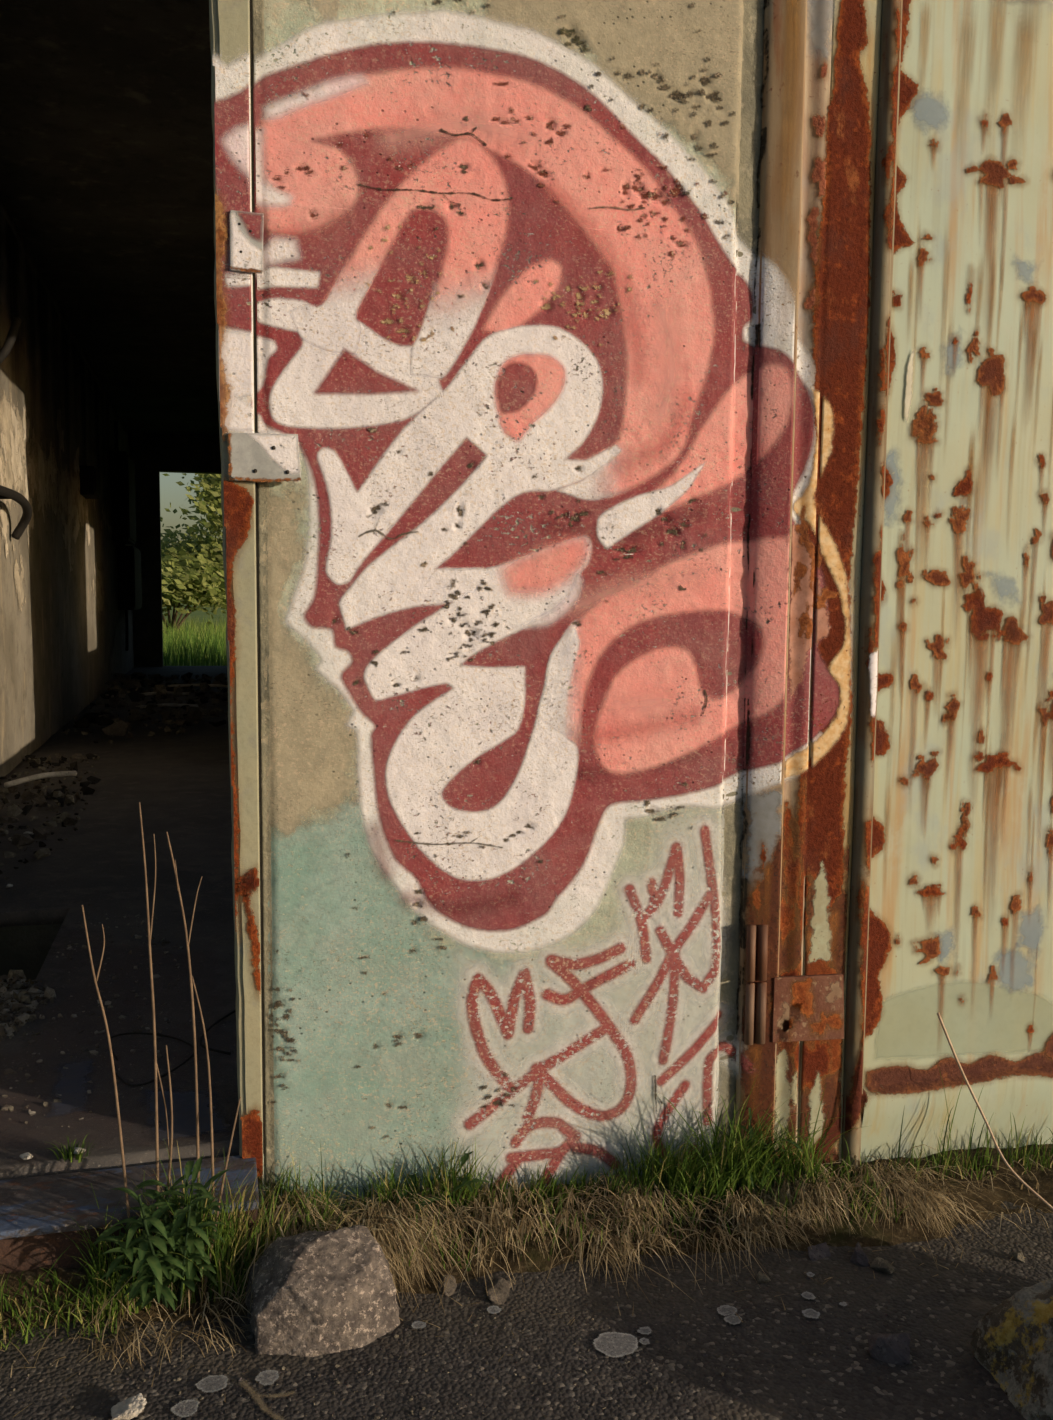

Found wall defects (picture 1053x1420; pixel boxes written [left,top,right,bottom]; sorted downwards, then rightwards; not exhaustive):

spalling [760,28,769,109]
peeling [434,0,744,257]
spalling [756,127,767,208]
spalling [751,324,761,400]
corrosion [215,193,301,994]
spalling [747,514,755,587]
corrosion [739,0,1053,1165]
spalling [743,698,751,770]
spalling [739,878,747,949]
corrosion [240,1108,263,1177]